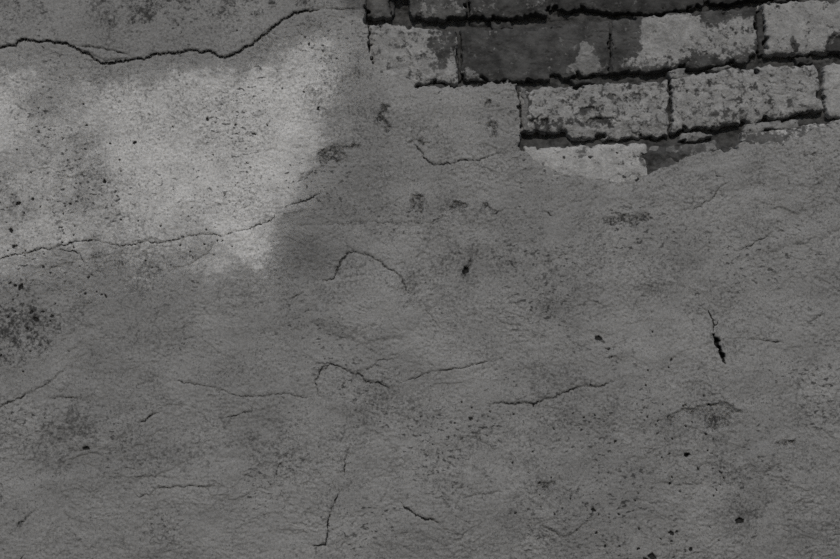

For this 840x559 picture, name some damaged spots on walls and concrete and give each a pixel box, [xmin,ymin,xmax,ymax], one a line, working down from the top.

crack [0,8,351,65]
flaking render [366,0,840,182]
crack [0,214,275,260]
crack [326,251,403,282]